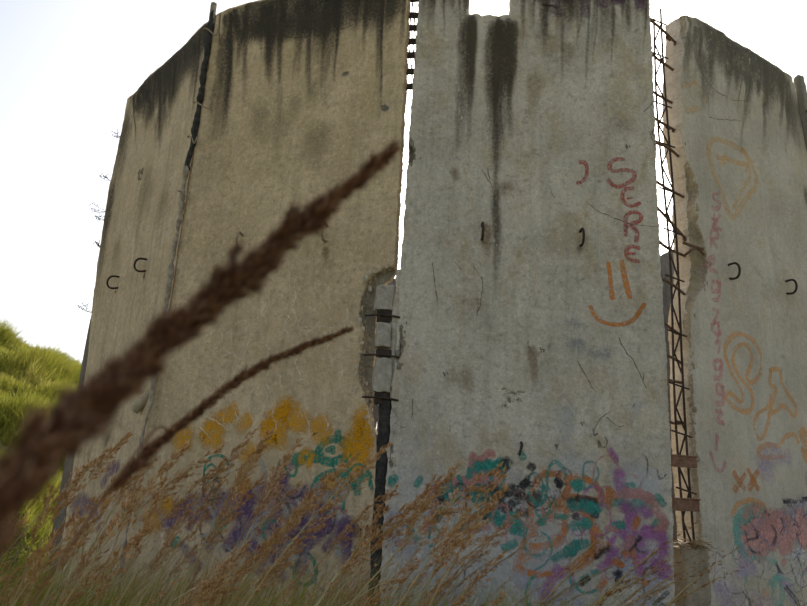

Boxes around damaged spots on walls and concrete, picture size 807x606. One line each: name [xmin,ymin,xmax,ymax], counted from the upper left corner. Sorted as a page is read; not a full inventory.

damp [119,23,207,155]
damp [218,0,406,106]
damp [459,0,475,109]
damp [488,19,516,121]
damp [523,0,647,36]
spalling [679,15,690,41]
damp [685,21,798,131]
damp [101,187,113,254]
damp [492,192,500,247]
spalling [351,263,395,419]
spalling [395,321,407,370]
spalling [682,163,712,544]